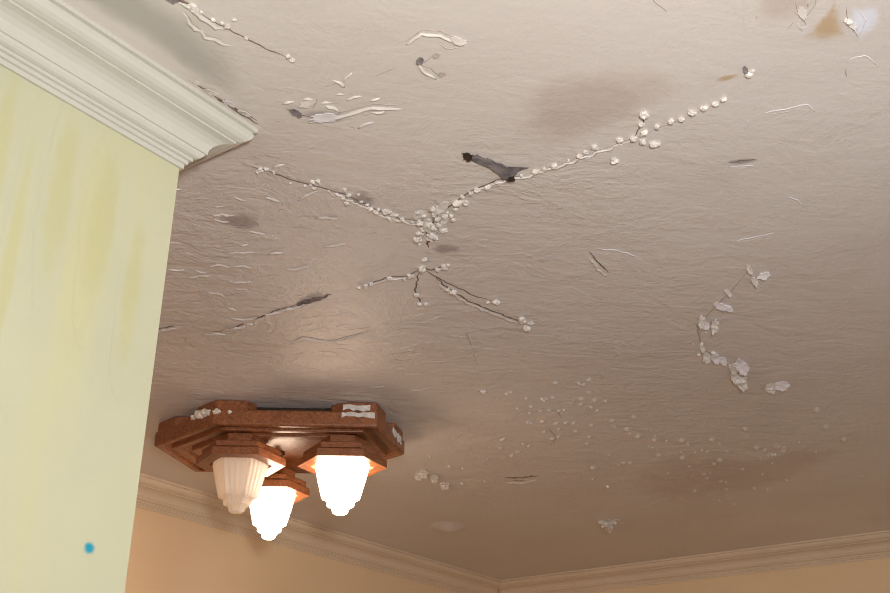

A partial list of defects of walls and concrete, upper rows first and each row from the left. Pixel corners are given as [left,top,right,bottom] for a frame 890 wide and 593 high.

water stain [69,0,267,120]
crack [168,0,295,63]
peeling [406,29,467,80]
peeling [832,0,885,76]
crack [189,79,257,124]
peeling [272,73,403,129]
crack [241,97,727,364]
crack [205,294,332,336]